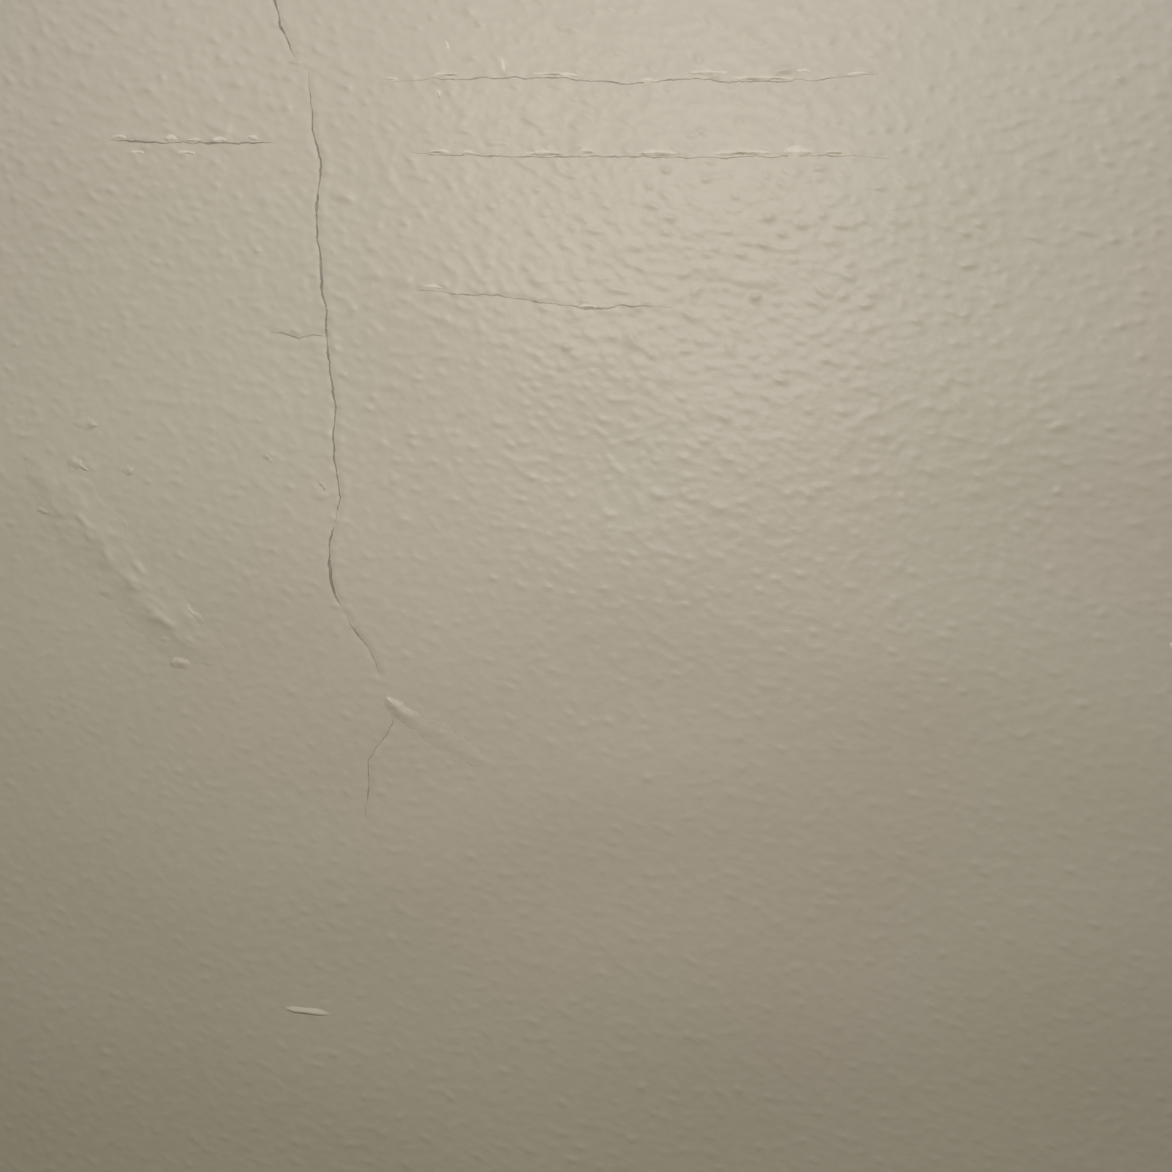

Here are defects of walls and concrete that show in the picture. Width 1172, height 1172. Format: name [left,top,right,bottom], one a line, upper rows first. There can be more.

crack [270,0,380,673]
crack [365,720,393,816]